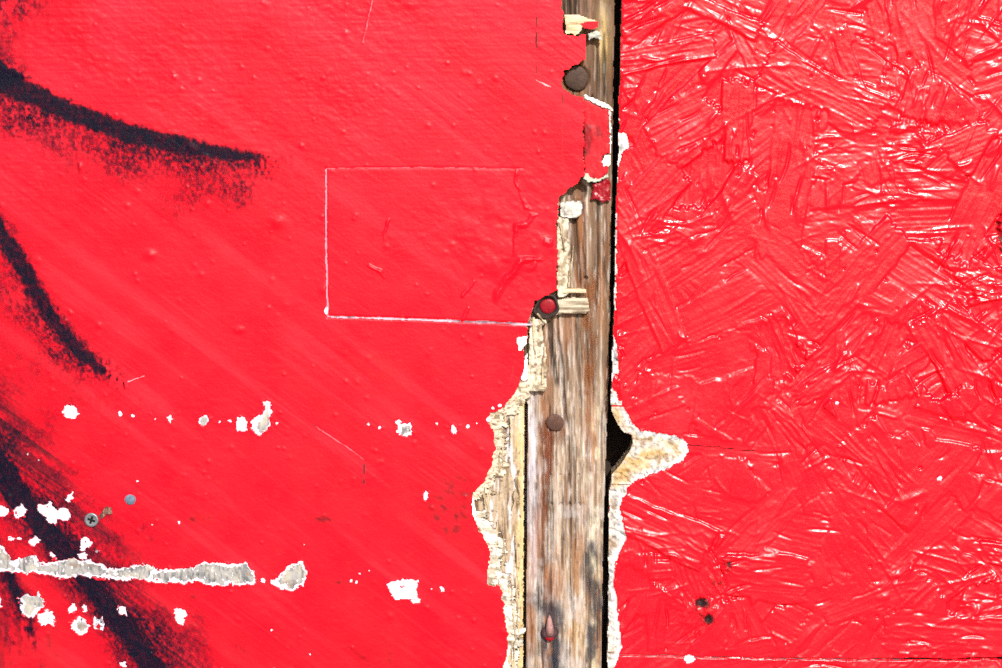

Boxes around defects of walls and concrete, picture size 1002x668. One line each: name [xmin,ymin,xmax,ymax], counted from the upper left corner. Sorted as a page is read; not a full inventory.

spalling [584,94,629,183]
peeling [517,336,528,381]
peeling [198,400,279,435]
peeling [0,491,74,526]
spalling [607,334,689,668]
peeling [0,536,307,591]
peeling [16,591,56,626]
peeling [68,603,104,635]
peeling [174,608,187,625]
peeling [386,578,421,604]